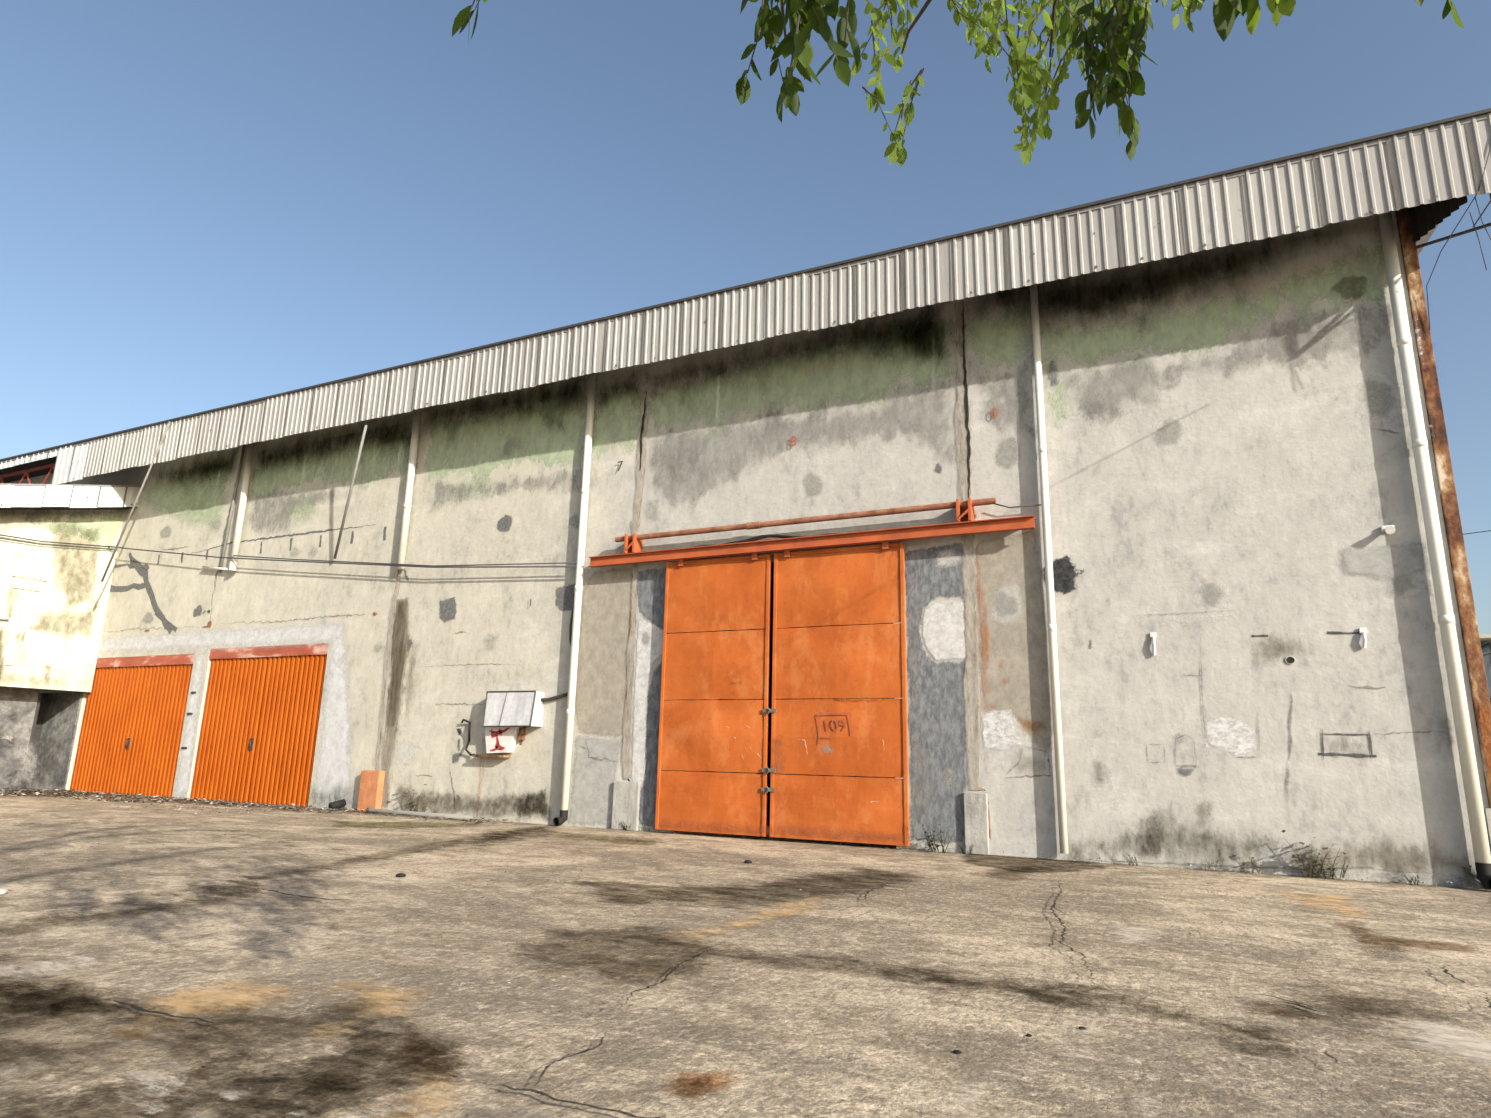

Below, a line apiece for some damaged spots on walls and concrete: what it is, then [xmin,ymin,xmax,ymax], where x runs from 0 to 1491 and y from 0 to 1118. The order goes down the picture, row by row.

damp [979,233,1327,315]
damp [656,306,943,385]
damp [430,379,581,423]
damp [382,599,410,807]
crack [1050,878,1094,983]
crack [449,946,713,1118]